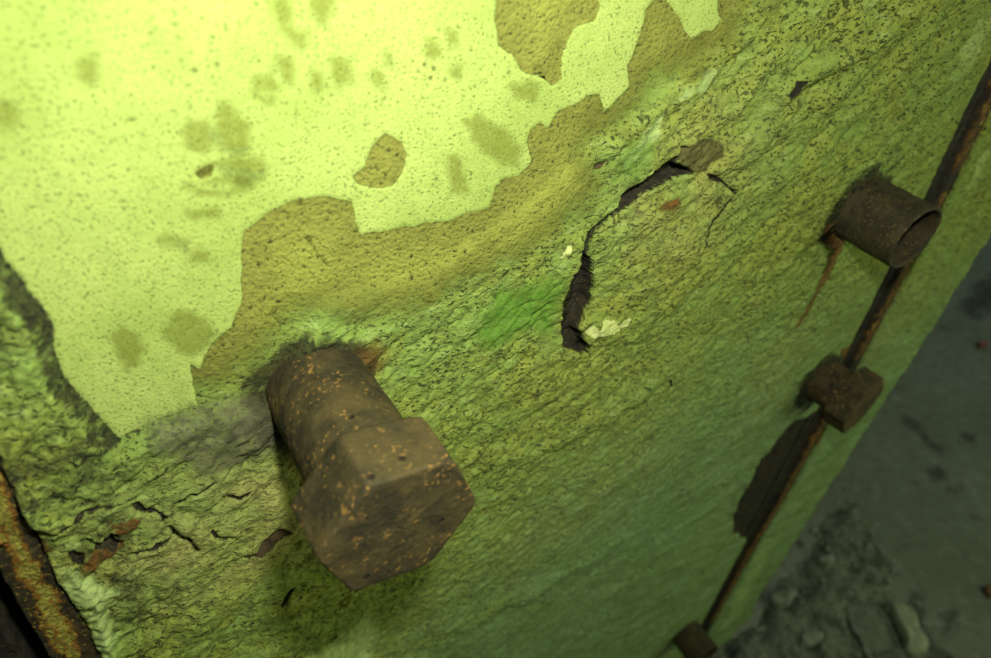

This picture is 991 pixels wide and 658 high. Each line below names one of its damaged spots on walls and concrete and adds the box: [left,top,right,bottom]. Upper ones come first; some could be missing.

peeling [191,0,738,384]
crack [560,138,737,354]
corrosion [796,223,845,327]
corrosion [83,519,140,573]
crack [41,482,250,555]